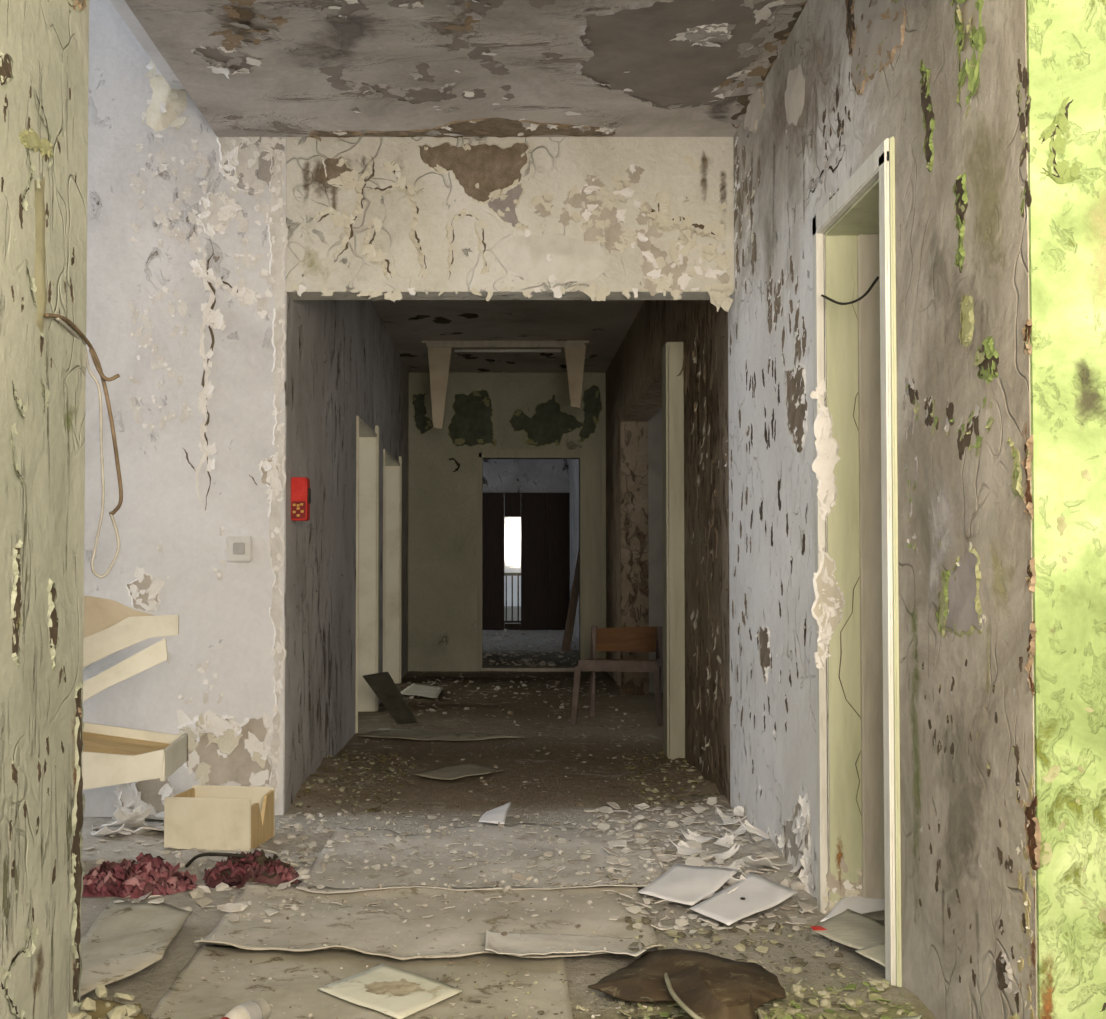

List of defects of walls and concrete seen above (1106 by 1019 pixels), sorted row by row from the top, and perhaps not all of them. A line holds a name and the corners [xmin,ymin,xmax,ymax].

peeling [0,51,14,134]
peeling [538,0,786,110]
peeling [810,0,907,151]
peeling [919,59,935,172]
peeling [950,0,986,120]
crack [314,156,490,281]
peeling [308,37,840,522]
peeling [125,137,307,802]
peeling [11,539,23,666]
peeling [677,326,799,774]
peeling [803,545,845,670]
peeling [909,487,986,638]